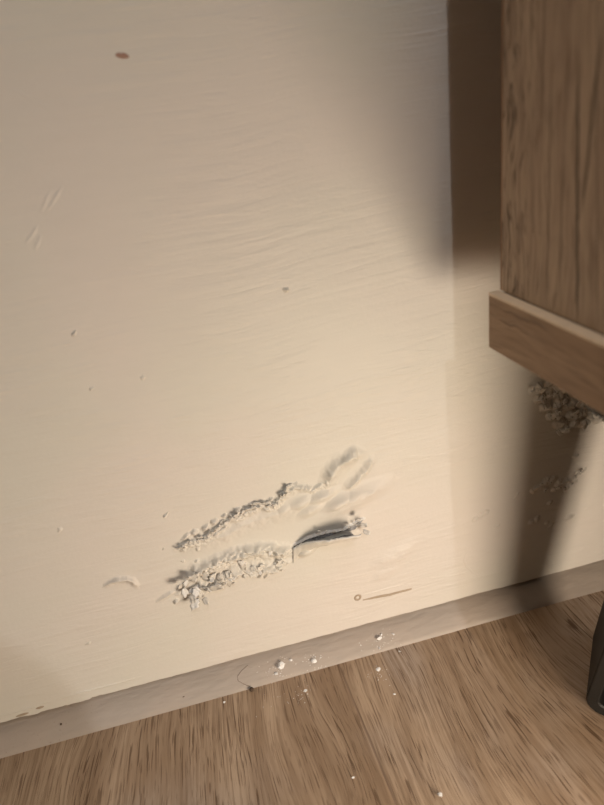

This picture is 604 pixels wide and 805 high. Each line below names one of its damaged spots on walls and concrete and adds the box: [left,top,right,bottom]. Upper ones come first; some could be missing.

peeling [527,381,604,437]
peeling [155,444,395,611]